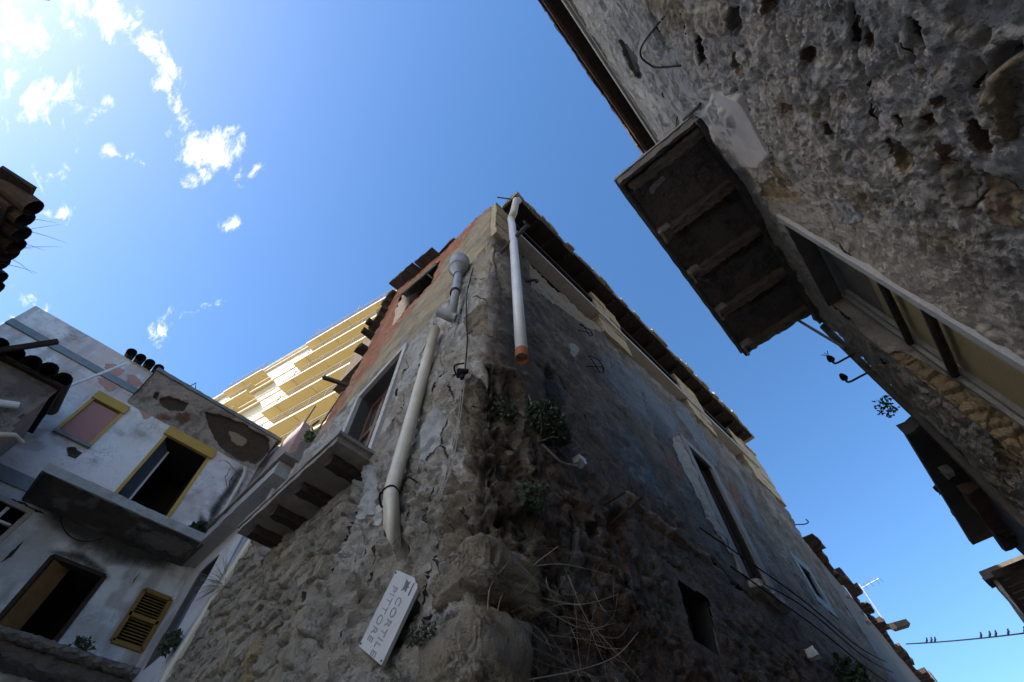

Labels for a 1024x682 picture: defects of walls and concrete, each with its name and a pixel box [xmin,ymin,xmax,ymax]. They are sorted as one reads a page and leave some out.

flaking render [694,2,742,38]
flaking render [757,0,778,15]
flaking render [730,52,744,76]
flaking render [800,45,817,63]
flaking render [967,50,1024,153]
flaking render [885,114,914,175]
flaking render [920,95,958,166]
flaking render [759,162,804,205]
flaking render [975,169,1024,231]
crack [390,278,489,461]
flaking render [153,392,188,423]
flaking render [205,412,270,464]